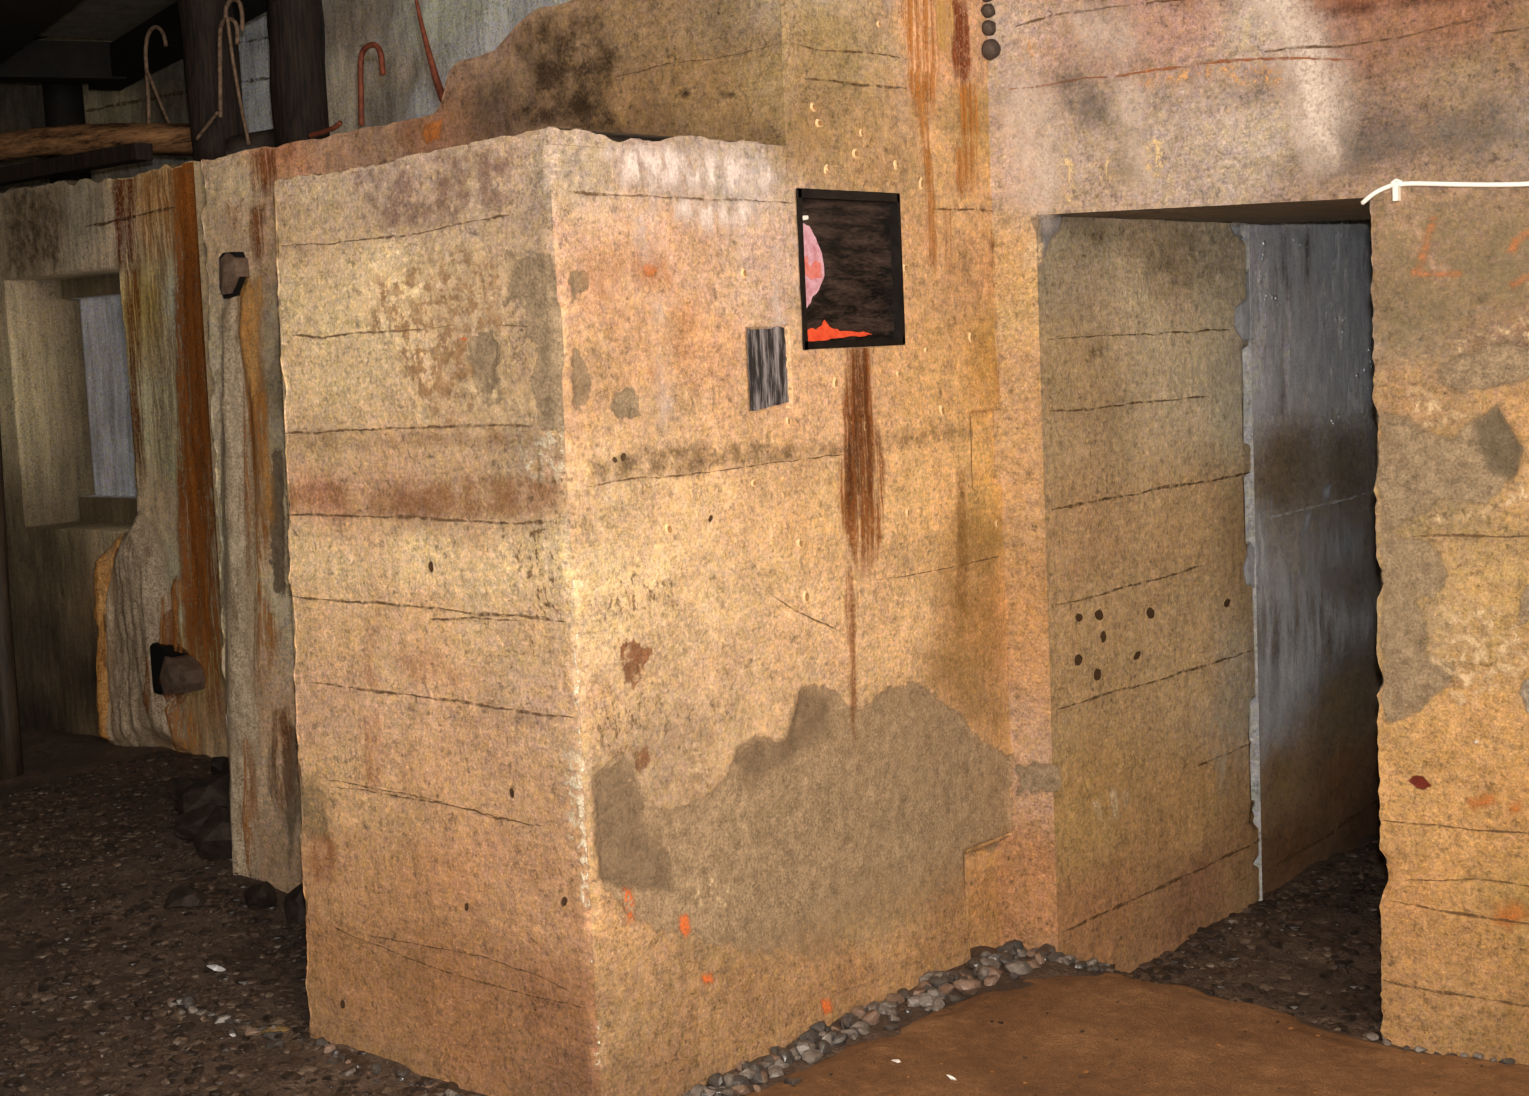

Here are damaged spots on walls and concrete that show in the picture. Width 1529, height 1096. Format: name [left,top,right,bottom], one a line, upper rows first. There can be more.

rust [905,0,978,255]
rust [113,162,222,701]
rust [848,574,856,711]
rust [840,348,884,557]
spalling [1377,400,1529,722]
spalling [1438,330,1529,392]